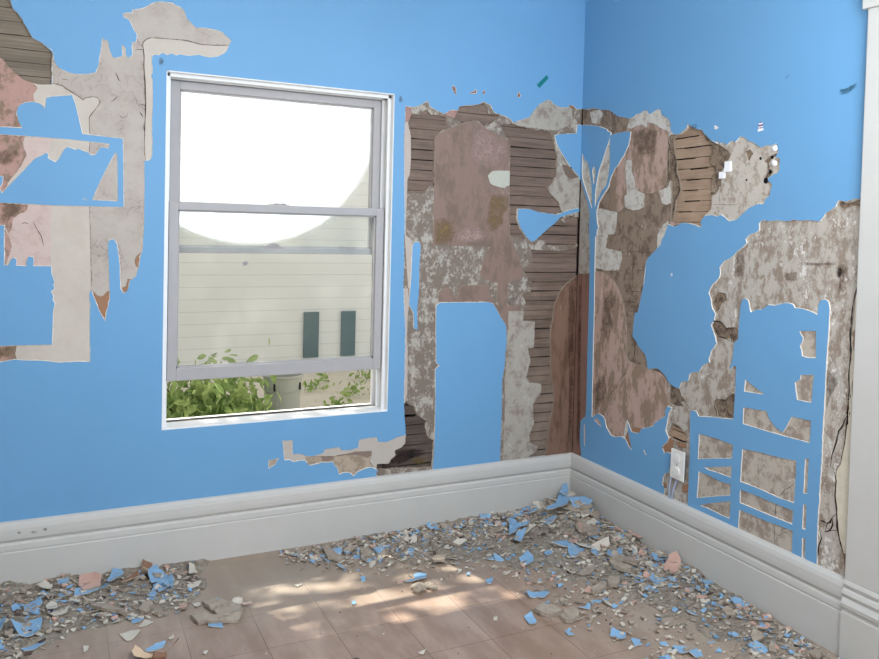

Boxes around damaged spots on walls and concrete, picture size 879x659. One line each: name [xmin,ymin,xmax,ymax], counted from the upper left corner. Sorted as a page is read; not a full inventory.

peeling [0,2,231,363]
peeling [268,89,861,576]
crack [817,288,857,562]